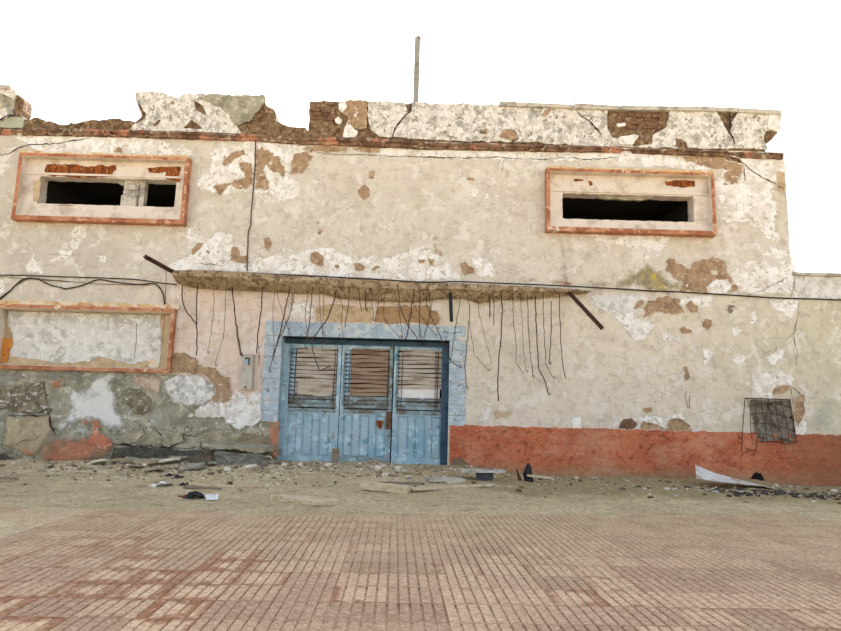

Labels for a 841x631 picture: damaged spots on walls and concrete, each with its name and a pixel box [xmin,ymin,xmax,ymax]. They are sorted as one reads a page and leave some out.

peeling [15,135,197,161]
crack [720,112,786,197]
peeling [25,224,88,274]
peeling [197,100,799,342]
peeling [167,225,566,423]
flaking render [0,279,337,473]
peeling [611,406,694,432]